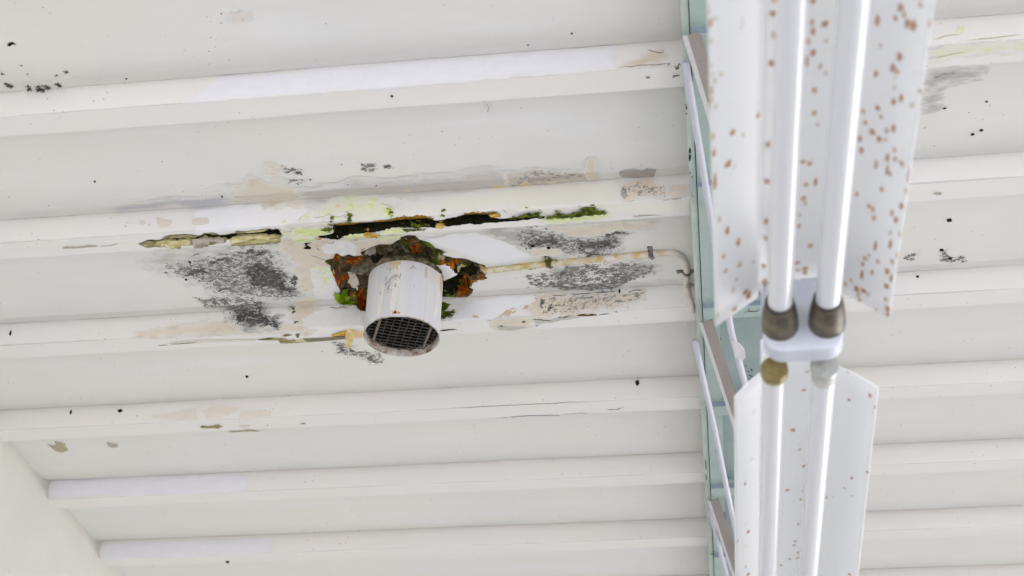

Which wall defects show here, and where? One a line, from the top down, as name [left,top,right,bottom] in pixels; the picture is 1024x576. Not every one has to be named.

peeling [619,148,694,202]
crack [279,203,611,245]
damp [133,243,314,339]
spalling [472,305,605,331]
damp [478,218,662,320]